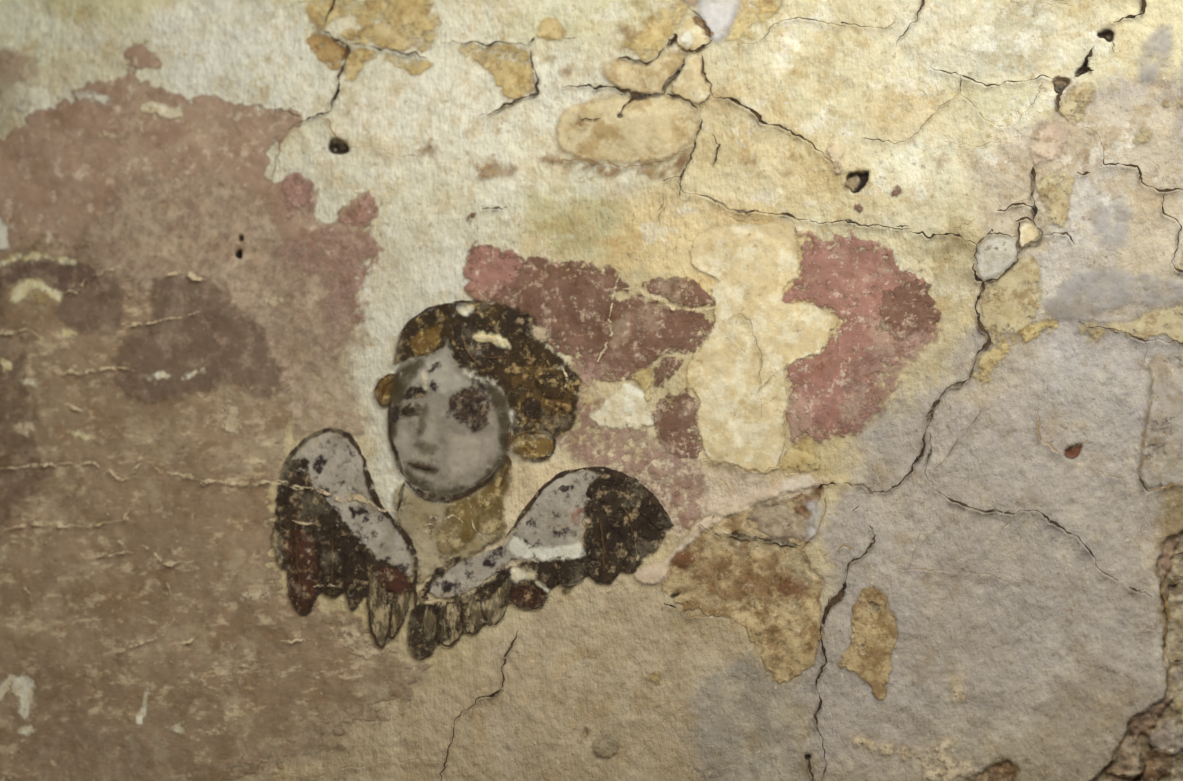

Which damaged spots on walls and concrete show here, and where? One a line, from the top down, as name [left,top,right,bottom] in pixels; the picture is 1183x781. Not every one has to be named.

peeling [300,0,441,81]
peeling [459,43,534,99]
peeling [537,18,566,40]
peeling [620,0,689,61]
peeling [726,0,778,41]
peeling [10,278,62,304]
peeling [463,244,523,301]
crack [270,0,1183,781]
flaking render [661,487,824,684]
peeling [838,585,899,700]
flaking render [1093,532,1183,781]
flaking render [966,760,1019,781]